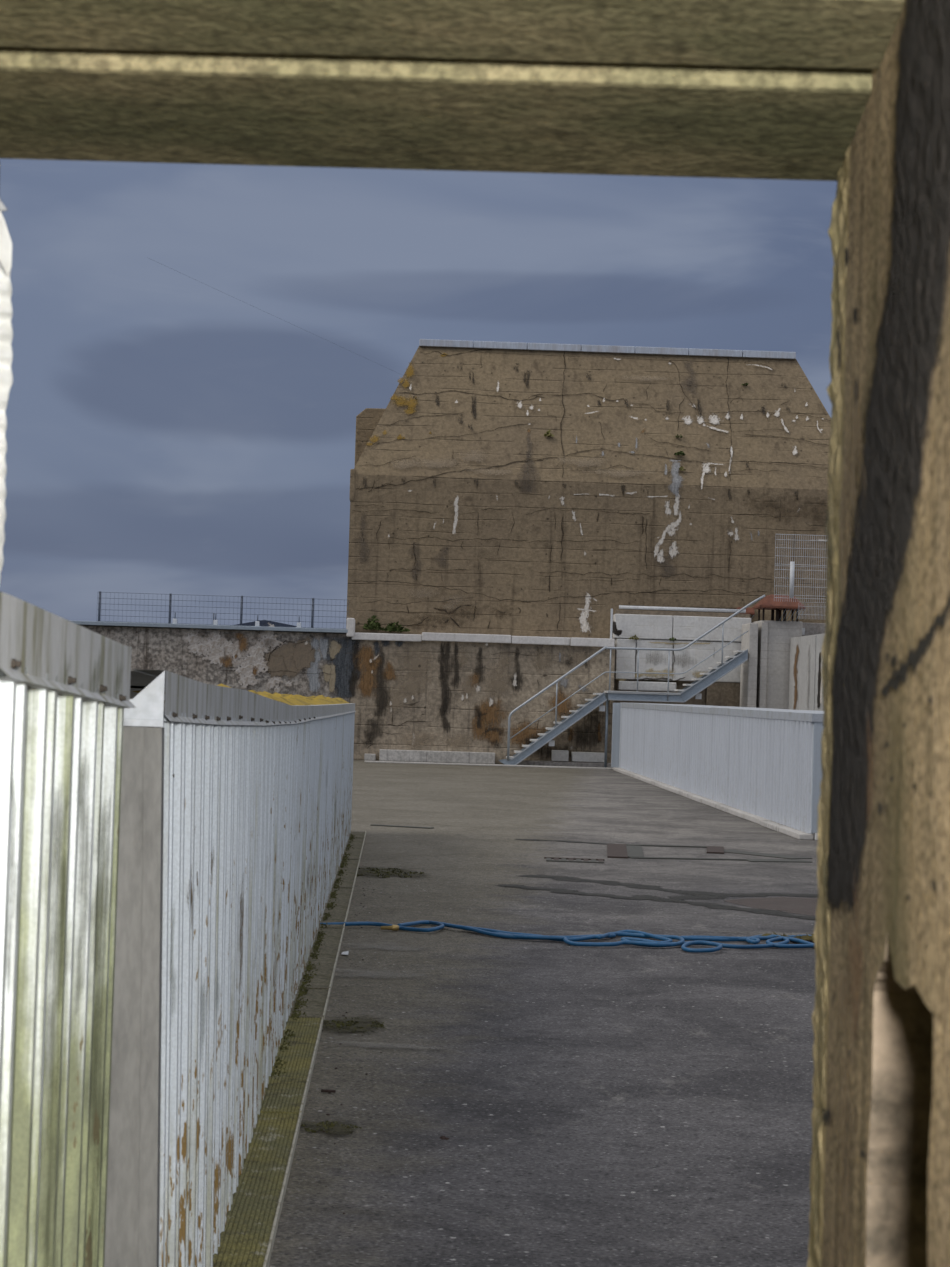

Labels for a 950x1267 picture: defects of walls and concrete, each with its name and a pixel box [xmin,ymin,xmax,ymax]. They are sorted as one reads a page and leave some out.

crack [354,324,857,684]
leakage [545,460,692,564]
peeling [182,622,336,693]
crack [368,665,432,747]
leakage [438,643,504,747]
leakage [511,648,523,690]
leakage [524,710,601,758]
corrosion [187,842,214,922]
corrosion [238,880,257,1026]